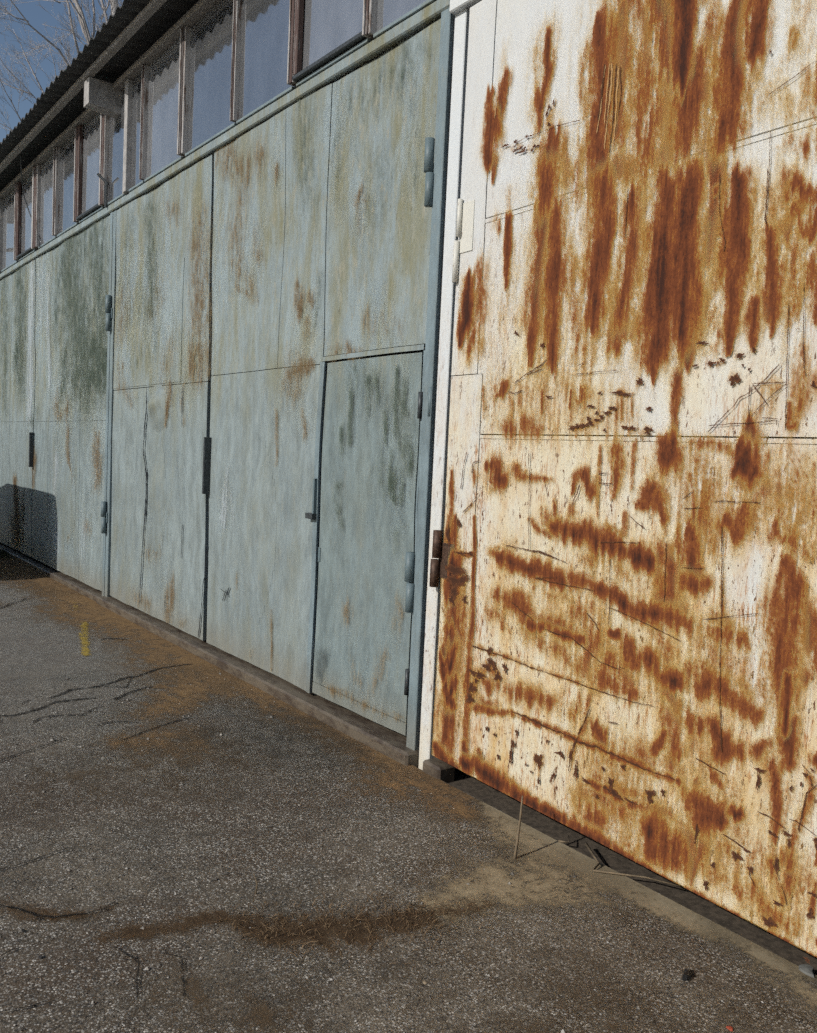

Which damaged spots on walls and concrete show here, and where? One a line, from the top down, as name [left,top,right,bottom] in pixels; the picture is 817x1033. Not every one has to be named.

leakage [13,268,49,421]
leakage [83,323,107,405]
corrosion [294,279,314,334]
leakage [339,383,353,454]
crack [139,388,165,607]
leakage [388,443,412,505]
corrosion [432,0,817,957]